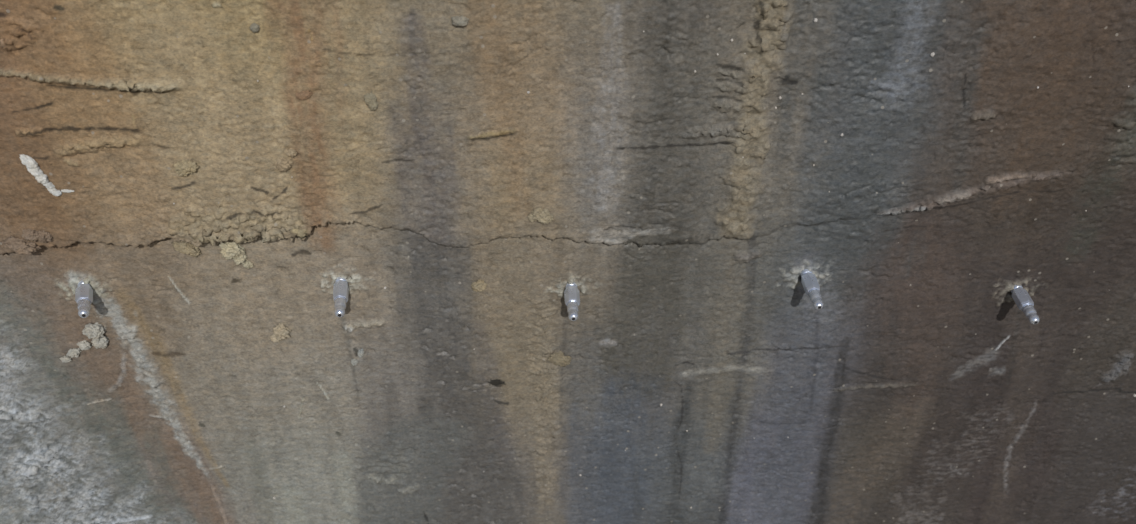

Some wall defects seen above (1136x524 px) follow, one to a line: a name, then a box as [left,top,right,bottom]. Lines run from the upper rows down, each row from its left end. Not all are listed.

crack [168,180,197,192]
crack [113,185,566,258]
crack [381,157,415,165]
crack [613,139,739,151]
crack [594,189,1062,247]
damp [241,4,539,524]
damp [559,0,995,524]
damp [0,268,230,524]